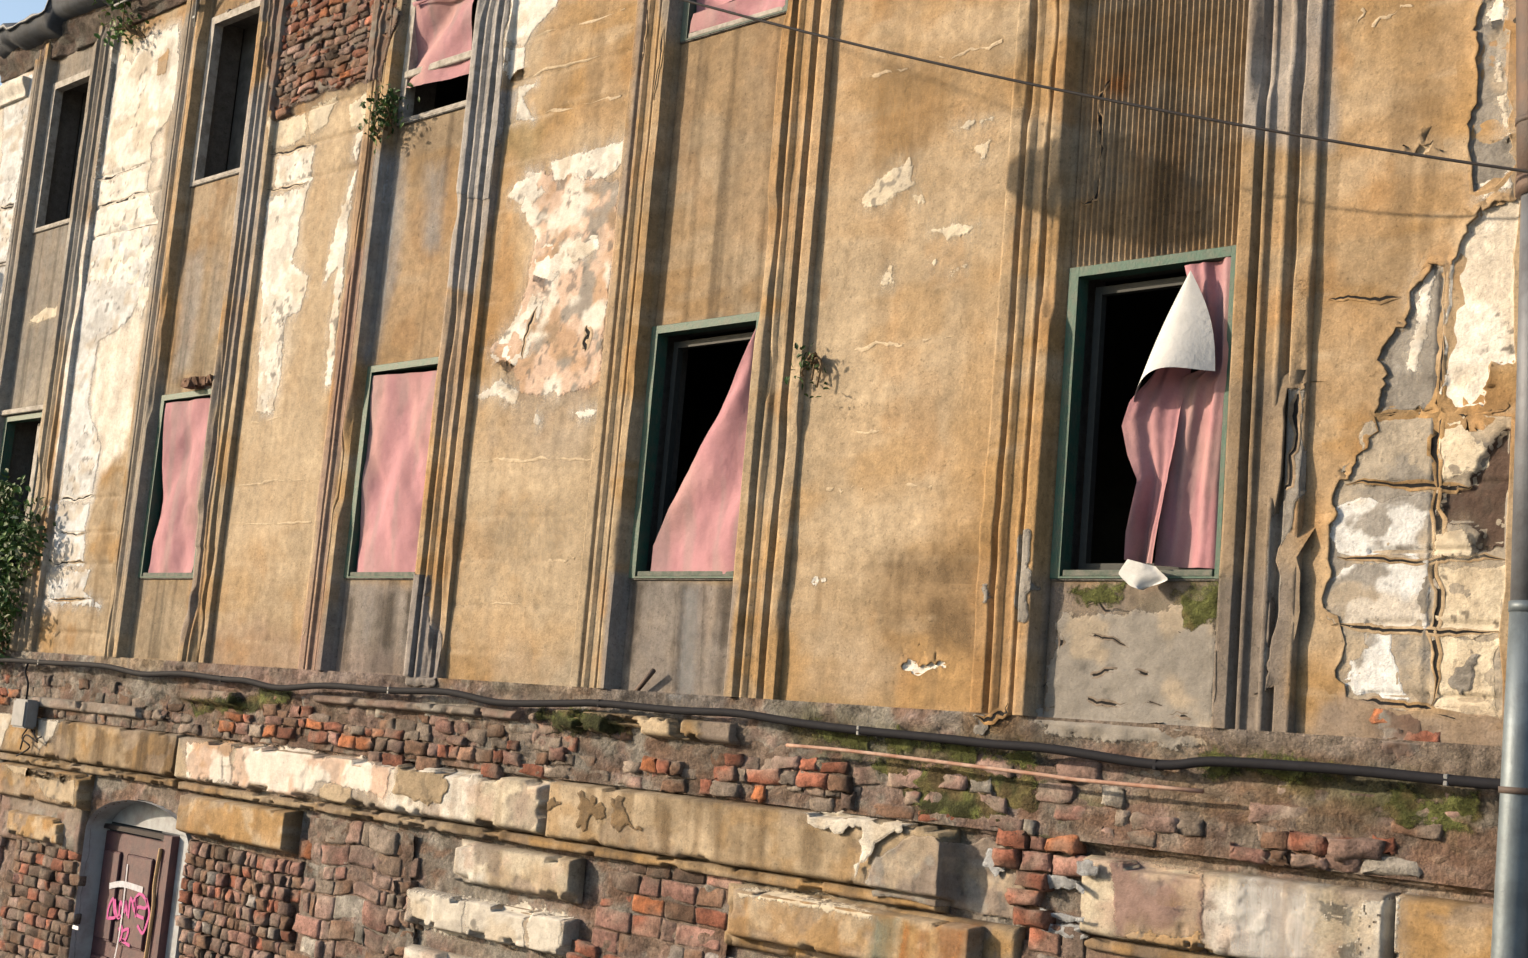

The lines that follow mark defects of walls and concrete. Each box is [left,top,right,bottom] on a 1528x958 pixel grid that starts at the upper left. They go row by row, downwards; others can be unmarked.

crack [0,202,14,211]
peeling [0,74,33,303]
spalling [30,306,57,323]
peeling [48,24,180,608]
flaking render [225,0,405,423]
spalling [456,0,625,201]
peeling [476,140,624,425]
peeling [881,265,894,286]
peeling [862,157,925,208]
peeling [929,223,980,241]
peeling [960,117,994,159]
spalling [698,753,1213,957]